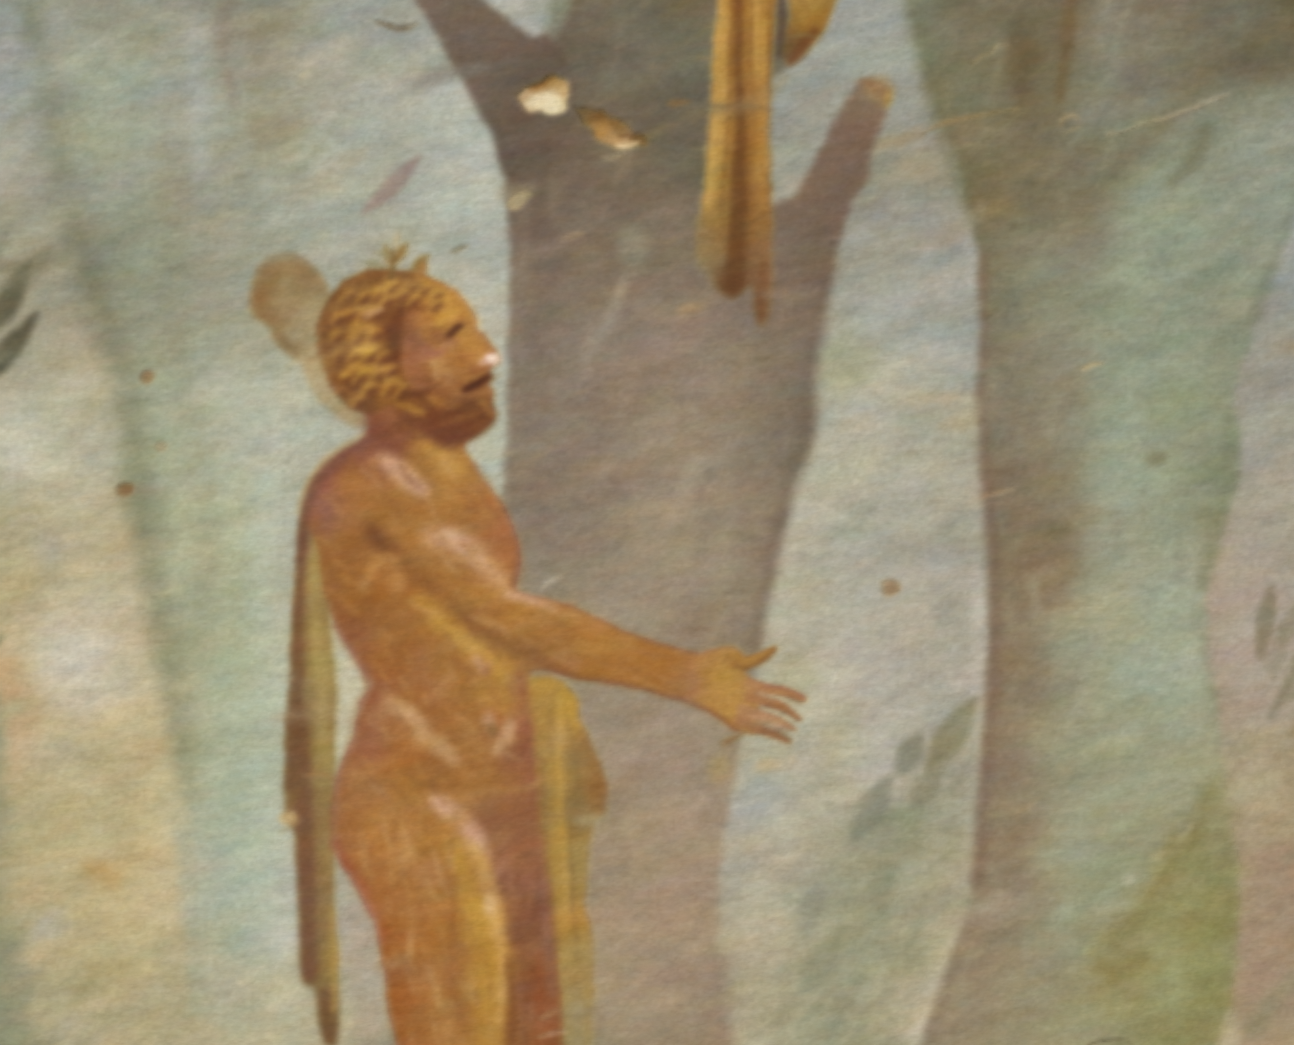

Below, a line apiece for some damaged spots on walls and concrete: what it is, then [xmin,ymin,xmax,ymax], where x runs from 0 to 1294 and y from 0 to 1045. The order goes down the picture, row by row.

flaking render [518,76,647,160]